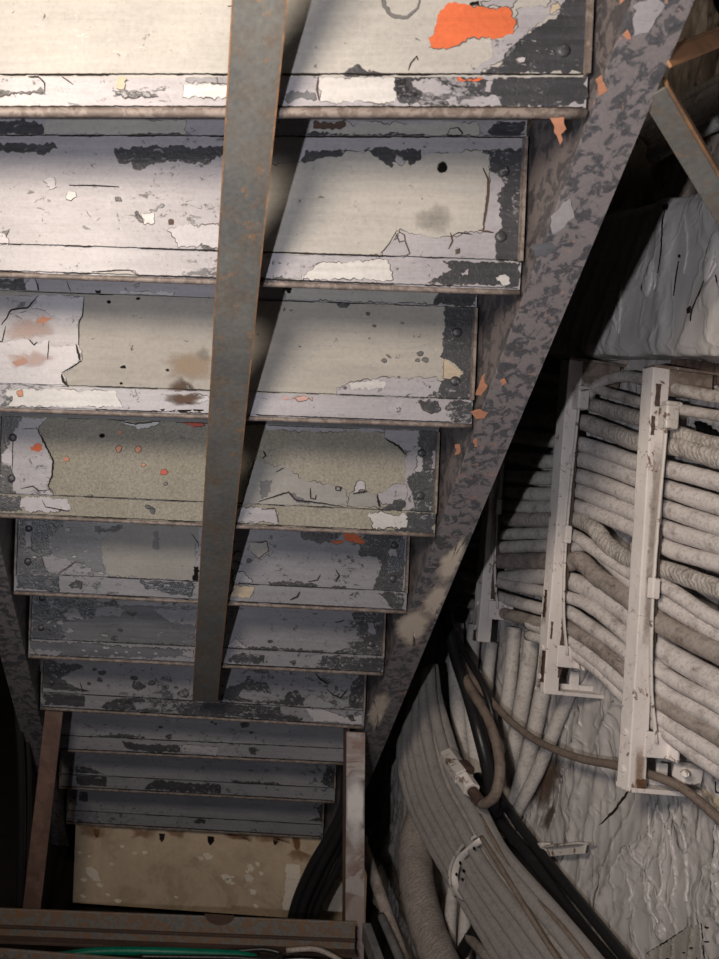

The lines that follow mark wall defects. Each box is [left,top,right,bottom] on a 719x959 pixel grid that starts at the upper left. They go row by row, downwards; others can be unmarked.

peeling [620,0,665,39]
peeling [0,76,45,97]
peeling [112,77,158,99]
peeling [183,77,227,101]
peeling [284,0,607,144]
peeling [0,118,223,171]
peeling [66,185,122,202]
peeling [530,199,575,257]
corrosion [216,0,288,703]
peeling [101,119,526,734]
peeling [0,271,200,707]
peeling [96,726,219,756]